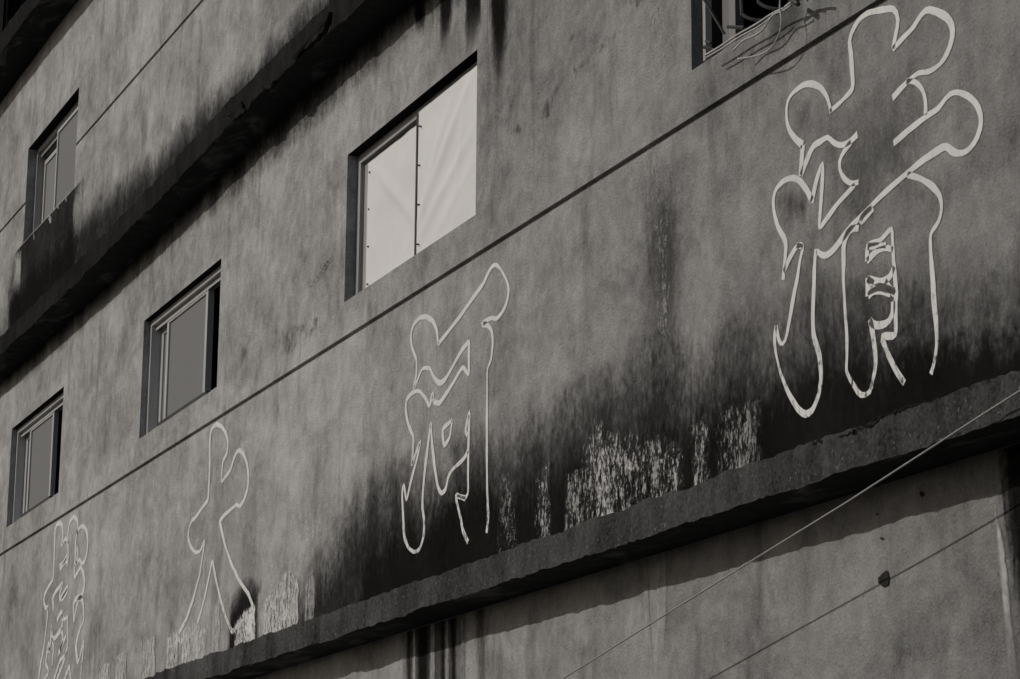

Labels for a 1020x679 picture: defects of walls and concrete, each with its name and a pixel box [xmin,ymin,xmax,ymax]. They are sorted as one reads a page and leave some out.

damp [4,0,451,385]
damp [465,0,507,66]
damp [140,301,1020,679]